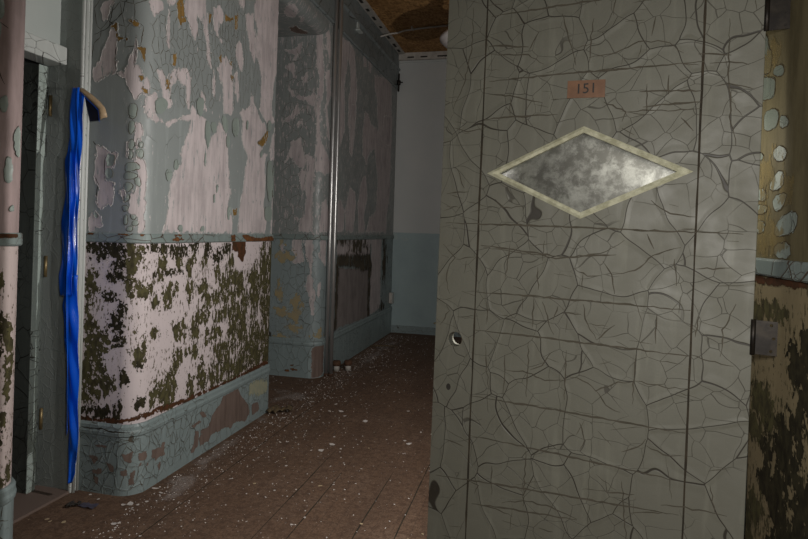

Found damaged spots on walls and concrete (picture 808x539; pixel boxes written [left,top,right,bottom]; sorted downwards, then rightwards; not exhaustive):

crack [562,14,684,64]
crack [714,18,753,146]
peeling [763,35,789,132]
peeling [3,126,21,183]
water stain [81,239,324,420]
peeling [88,0,382,316]
corrosion [231,235,274,262]
water stain [334,239,388,331]
water stain [753,297,789,327]
peeling [757,145,798,260]
crack [80,401,220,492]
water stain [745,323,808,539]